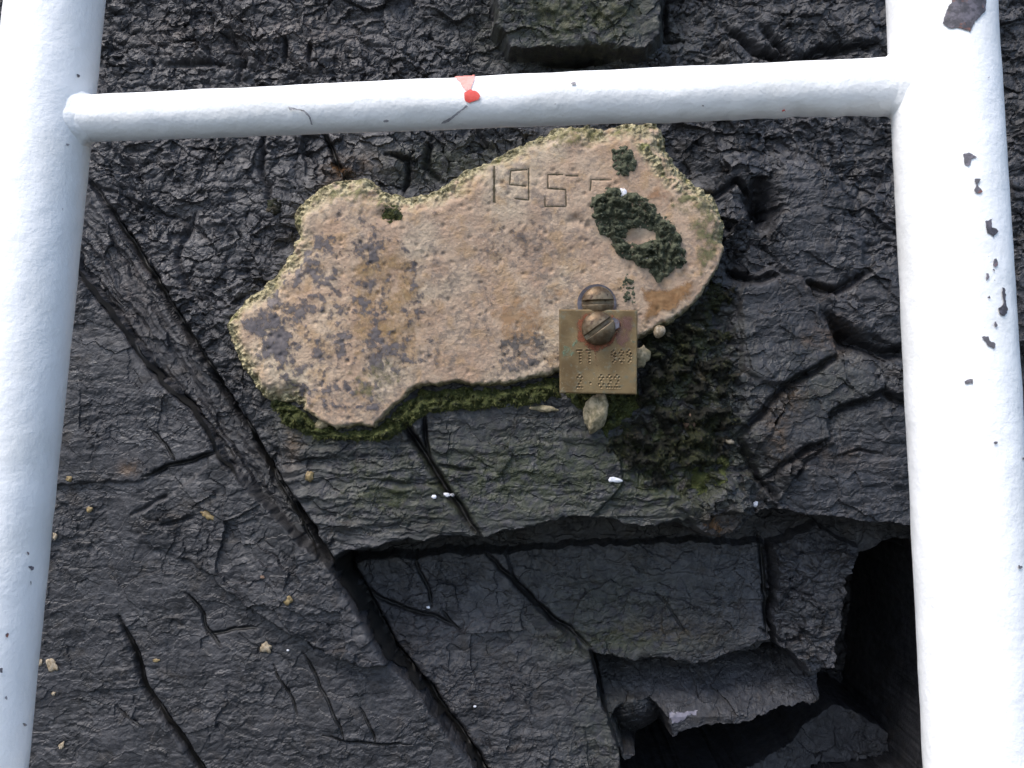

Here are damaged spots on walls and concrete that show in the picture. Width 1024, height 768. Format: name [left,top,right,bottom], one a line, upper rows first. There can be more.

peeling [943,0,986,31]
peeling [963,153,976,166]
peeling [985,219,998,237]
peeling [982,259,1008,349]
crack [79,182,487,768]
crack [406,417,608,713]